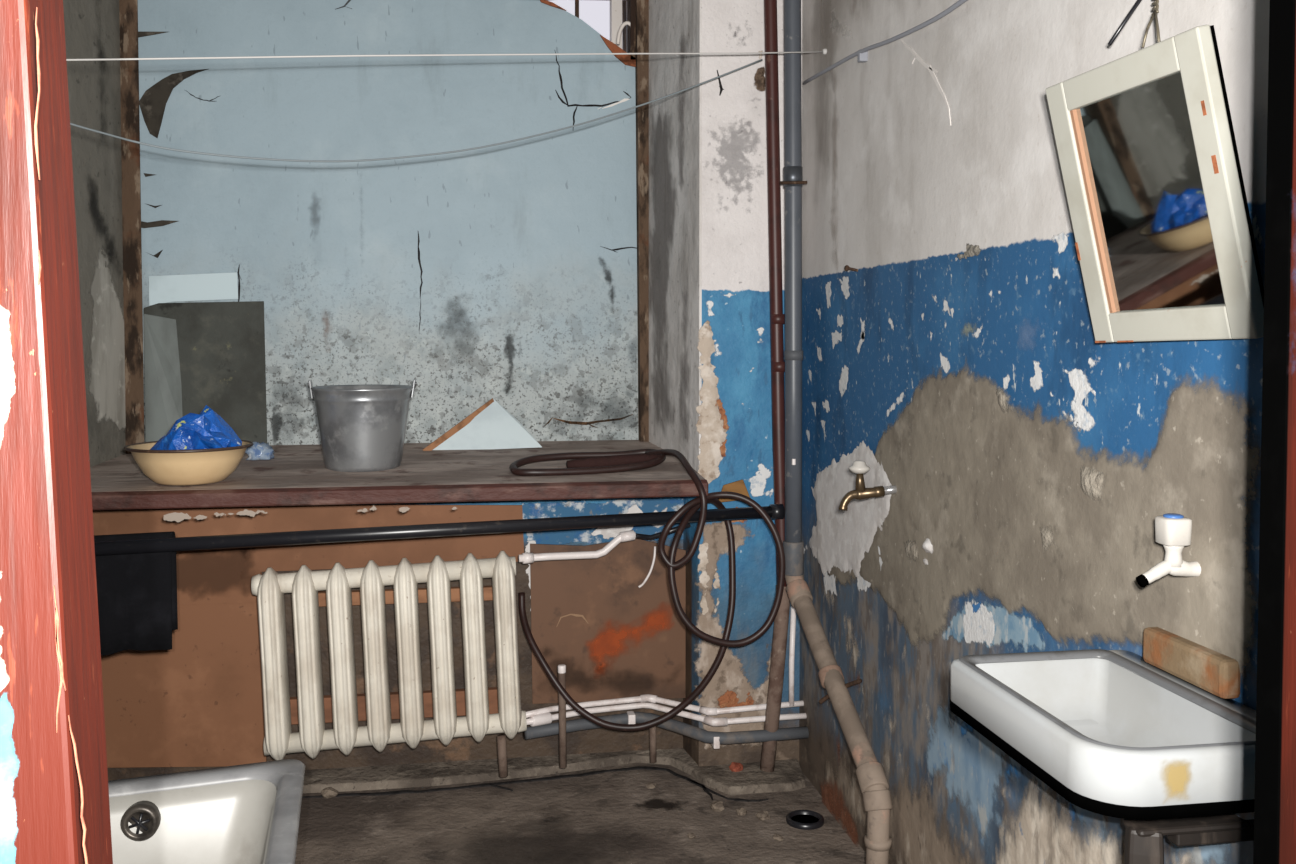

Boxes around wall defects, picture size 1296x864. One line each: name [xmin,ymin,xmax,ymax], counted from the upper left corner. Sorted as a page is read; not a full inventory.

crack [555,52,631,128]
water stain [272,409,282,440]
water stain [506,336,515,392]
spalling [696,293,736,484]
peeling [808,276,850,380]
peeling [857,317,865,354]
peeling [921,295,982,338]
peeling [749,464,773,497]
spalling [804,352,1260,675]
spalling [825,756,867,831]
peeling [885,706,1125,864]
peeling [1173,842,1230,864]